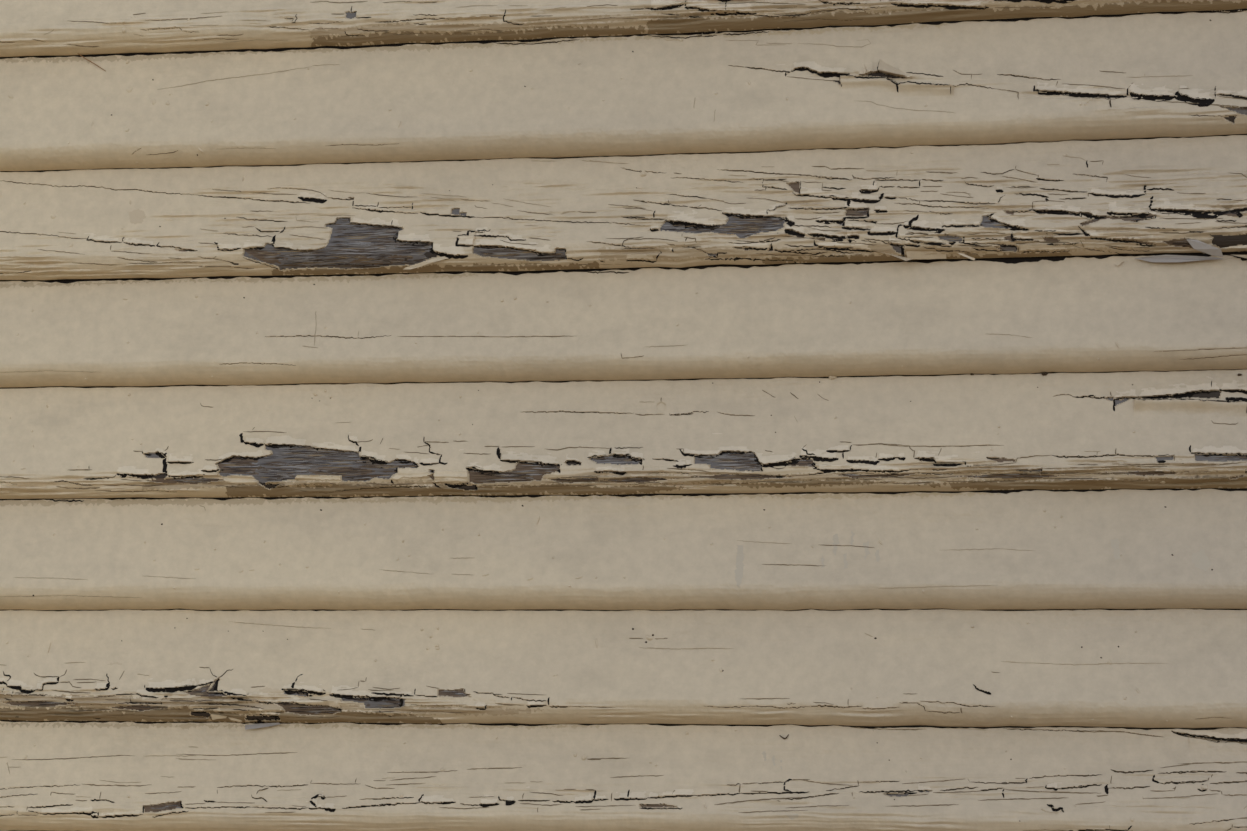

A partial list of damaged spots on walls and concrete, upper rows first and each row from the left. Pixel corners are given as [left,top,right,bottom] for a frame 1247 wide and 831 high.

peeling [650,0,752,12]
peeling [778,61,846,73]
peeling [1036,82,1247,115]
peeling [216,204,566,270]
peeling [651,182,1247,262]
peeling [1106,376,1247,406]
peeling [117,432,667,485]
peeling [674,433,1059,480]
peeling [1193,445,1247,479]
peeling [0,677,75,706]
peeling [112,678,412,730]
peeling [438,689,485,708]